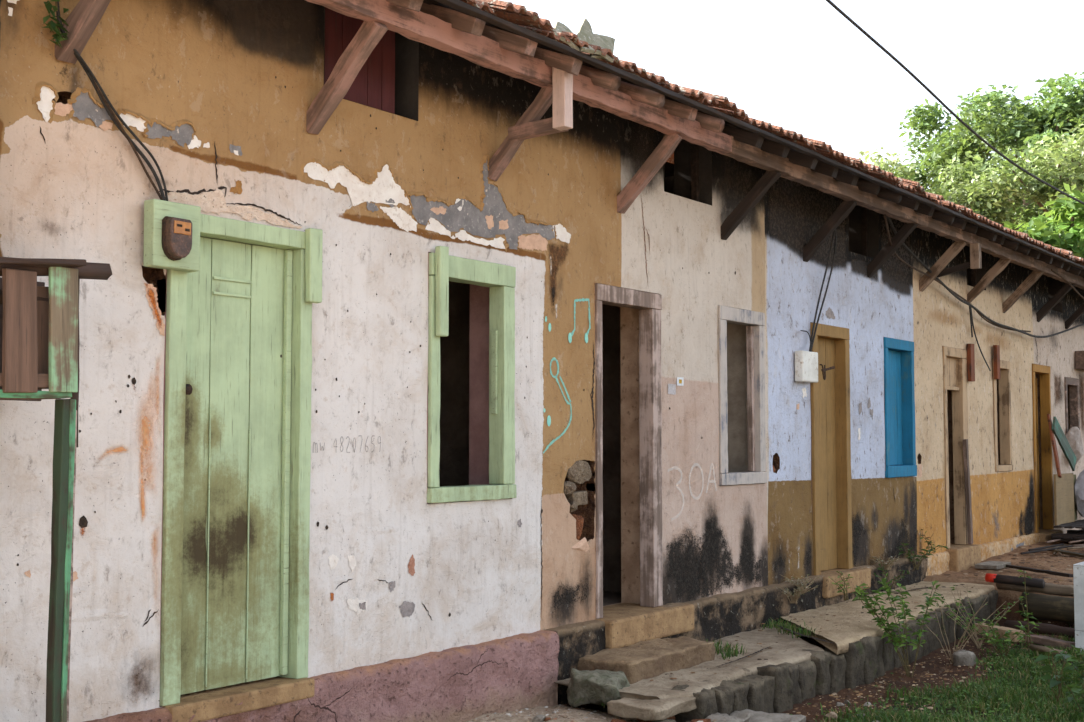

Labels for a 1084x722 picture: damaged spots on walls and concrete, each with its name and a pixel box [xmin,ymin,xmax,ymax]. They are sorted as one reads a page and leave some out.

peeling [32,81,210,149]
peeling [229,144,242,156]
spalling [167,179,303,229]
peeling [300,154,571,253]
spalling [143,281,165,336]
damp [549,245,568,317]
corrosion [142,416,150,451]
spalling [563,460,592,552]
damp [667,519,785,602]
damp [852,513,918,566]
damp [552,585,588,613]
crack [293,688,352,722]